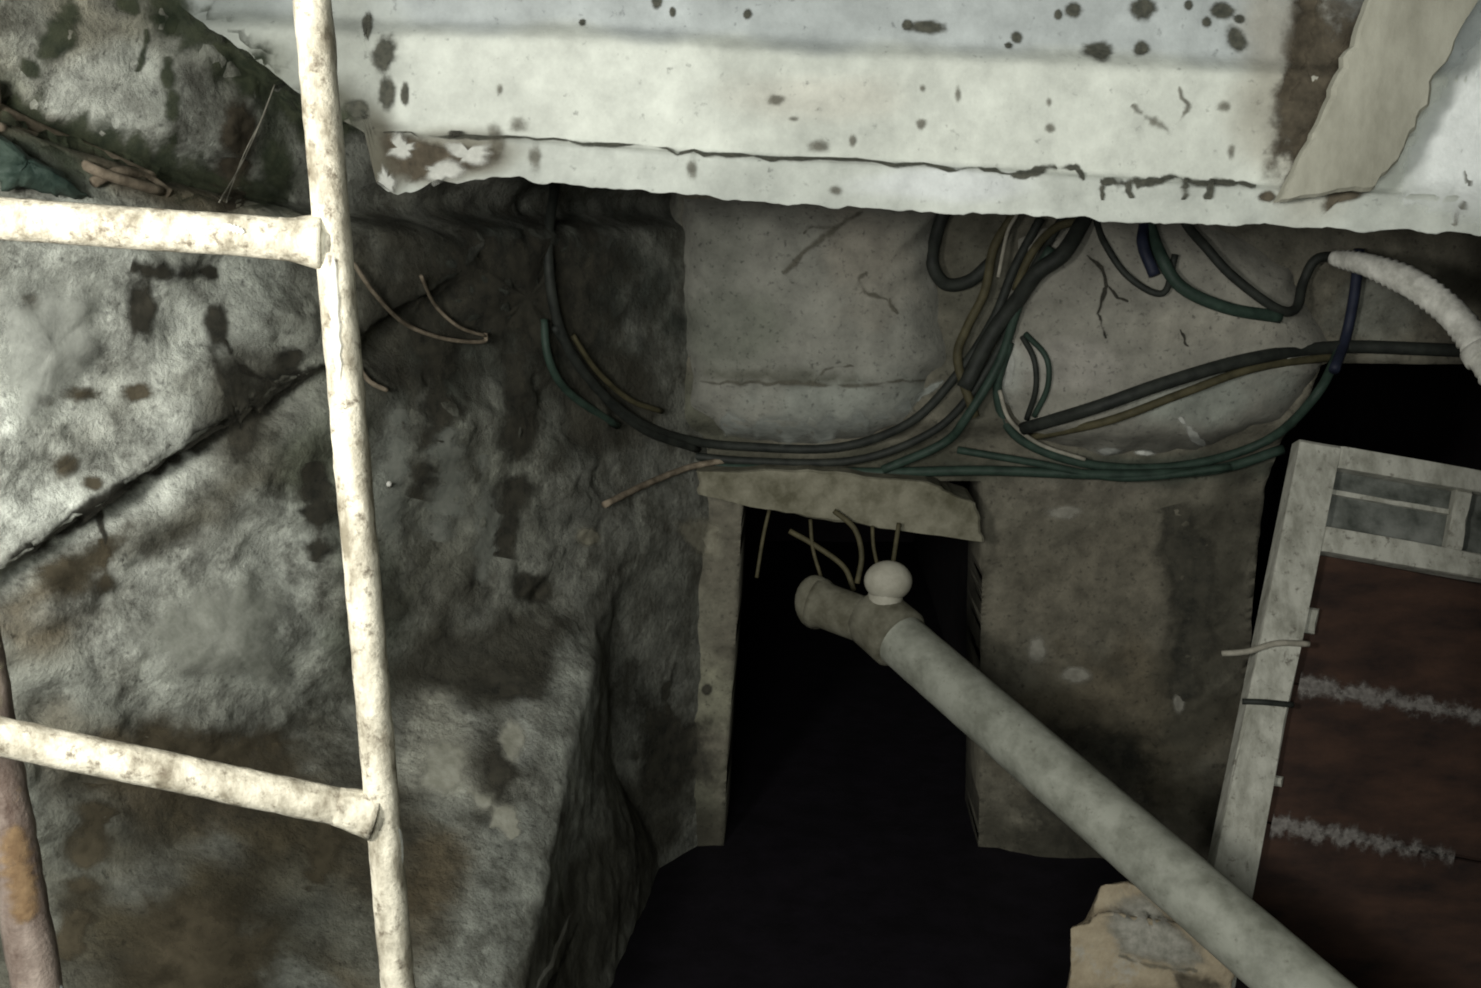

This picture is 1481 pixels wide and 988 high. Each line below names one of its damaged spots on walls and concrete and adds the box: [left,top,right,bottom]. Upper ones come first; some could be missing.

spalling [377,131,494,192]
crack [383,121,1017,175]
damp [1268,0,1364,176]
peeling [1407,41,1481,226]
crack [9,339,322,560]
damp [214,349,303,462]
damp [299,461,338,562]
damp [132,724,290,774]
damp [57,783,119,961]
damp [304,821,343,891]
damp [129,895,282,988]